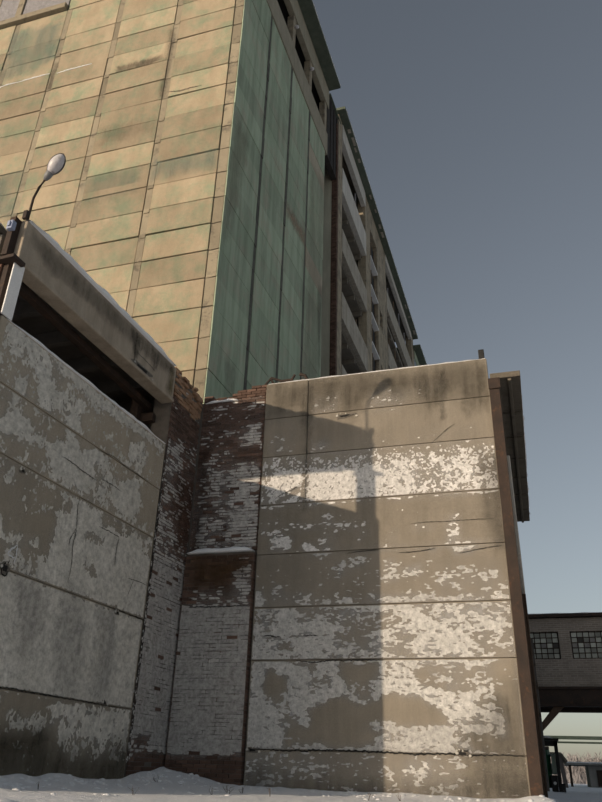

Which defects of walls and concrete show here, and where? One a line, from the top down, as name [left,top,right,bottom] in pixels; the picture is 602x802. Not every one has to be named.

crack [62,456,119,579]
peeling [0,323,515,796]